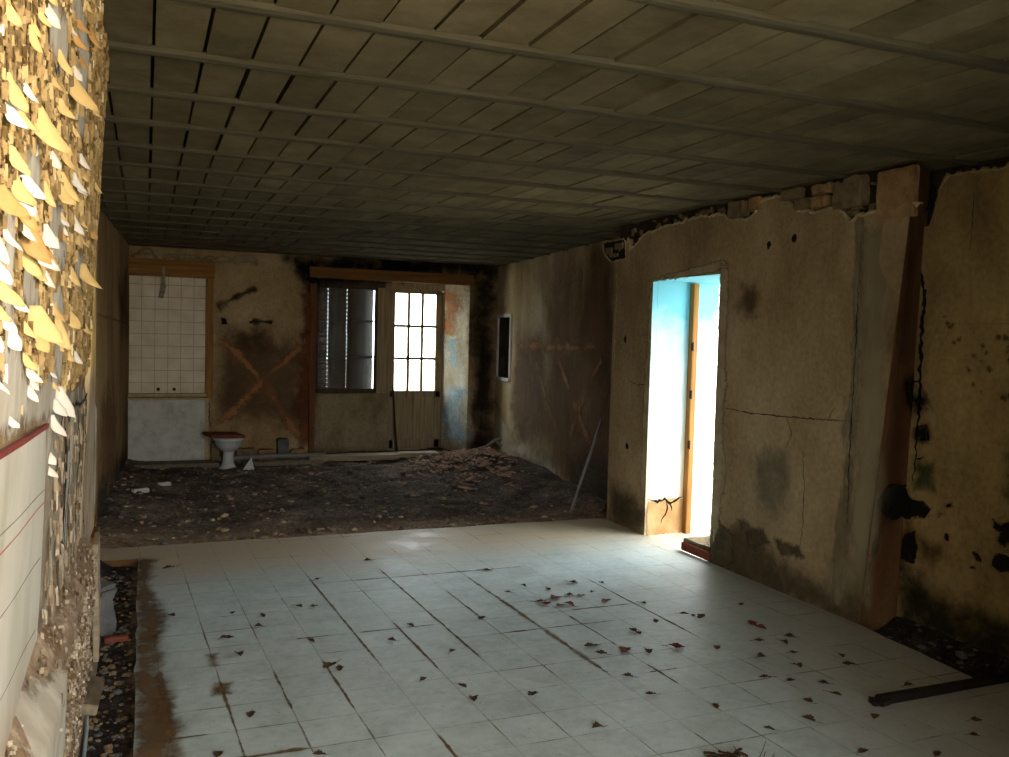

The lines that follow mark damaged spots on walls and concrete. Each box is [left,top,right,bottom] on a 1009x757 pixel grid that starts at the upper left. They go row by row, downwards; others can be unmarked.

peeling [0,0,110,640]
corrosion [219,338,304,438]
crack [725,408,858,544]
flaking render [603,162,1009,606]
damp [904,374,929,414]
crack [912,273,929,481]
damp [913,425,930,444]
damp [127,559,206,757]
damp [722,528,860,625]
damp [899,565,1009,659]
damp [213,682,304,757]